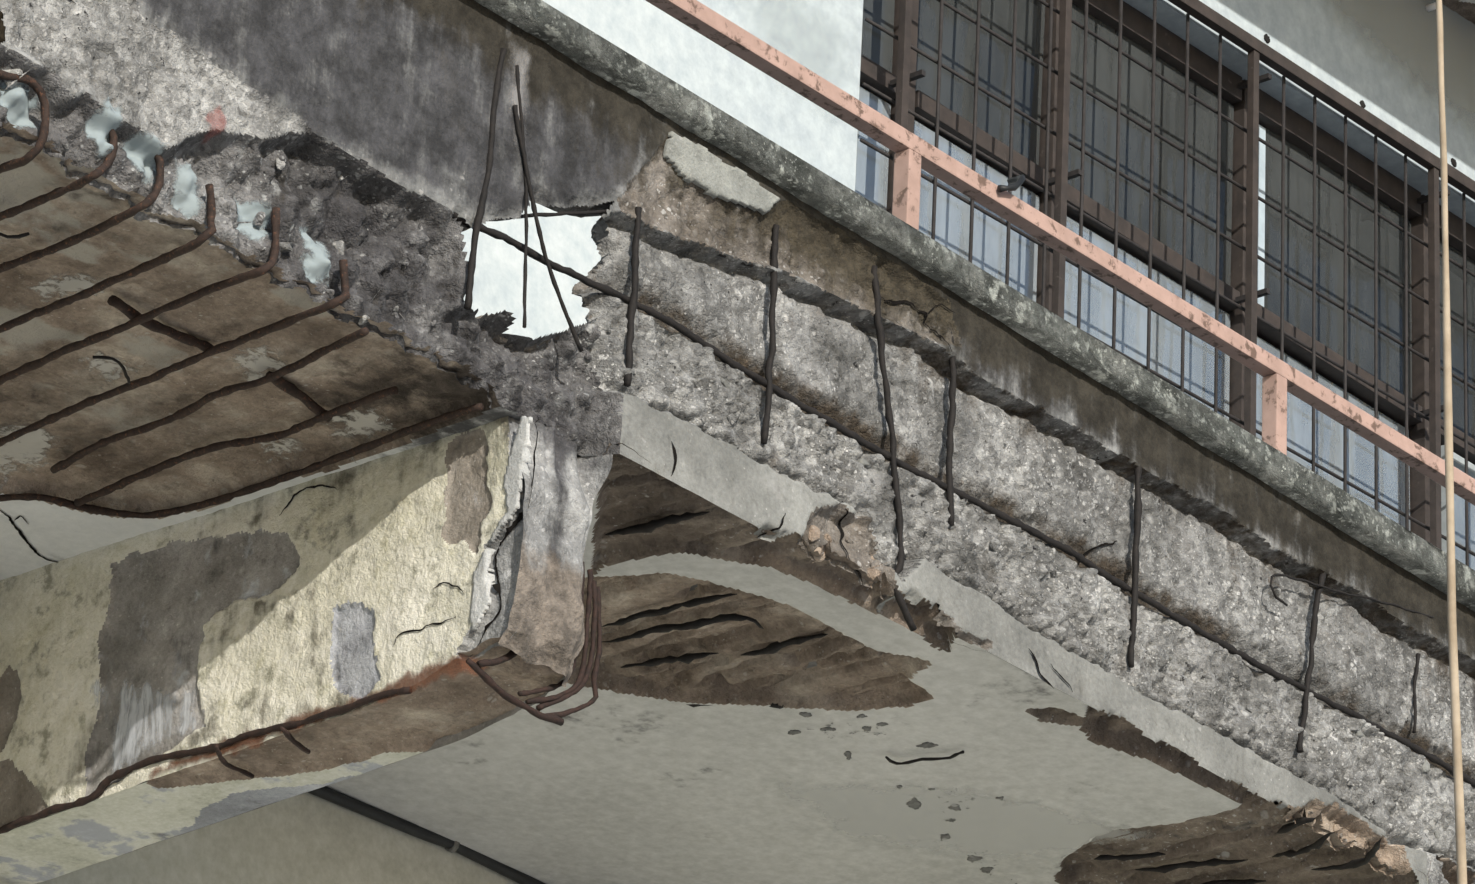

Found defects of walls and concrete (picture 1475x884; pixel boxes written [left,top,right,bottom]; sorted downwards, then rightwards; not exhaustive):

peeling [663,131,780,215]
spalling [0,44,624,542]
corrosion [152,707,325,777]
peeling [0,422,613,834]
corrosion [347,656,488,710]
spalling [549,207,1457,884]
spalling [1458,650,1475,884]